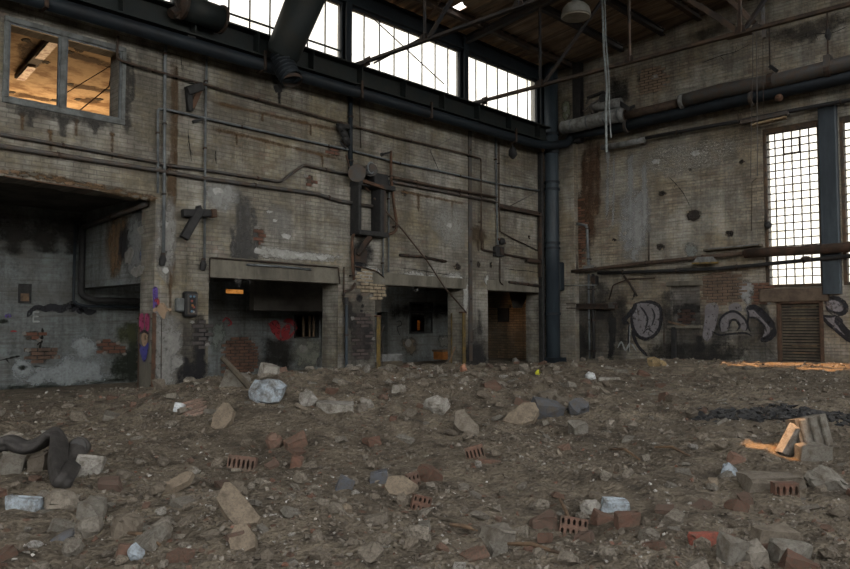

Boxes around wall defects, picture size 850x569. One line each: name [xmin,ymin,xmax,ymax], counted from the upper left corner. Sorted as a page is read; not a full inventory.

water stain [12,105,108,137]
corrosion [167,63,179,314]
peeling [206,182,238,211]
spalling [0,170,176,283]
peeling [253,226,341,263]
flaking render [355,266,386,300]
flaking render [701,272,775,305]
flaking render [22,331,60,363]
water stain [1,323,138,390]